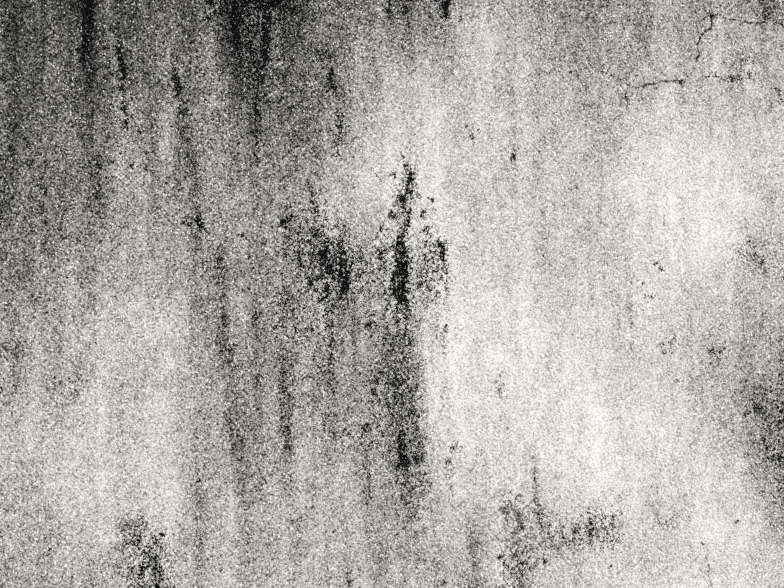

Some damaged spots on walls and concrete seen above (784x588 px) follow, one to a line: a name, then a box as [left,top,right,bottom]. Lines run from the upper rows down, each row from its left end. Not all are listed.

damp [90,40,137,207]
damp [174,90,204,250]
damp [209,0,284,187]
crack [543,10,784,110]
damp [213,244,245,497]
damp [249,152,449,530]
damp [743,400,784,503]